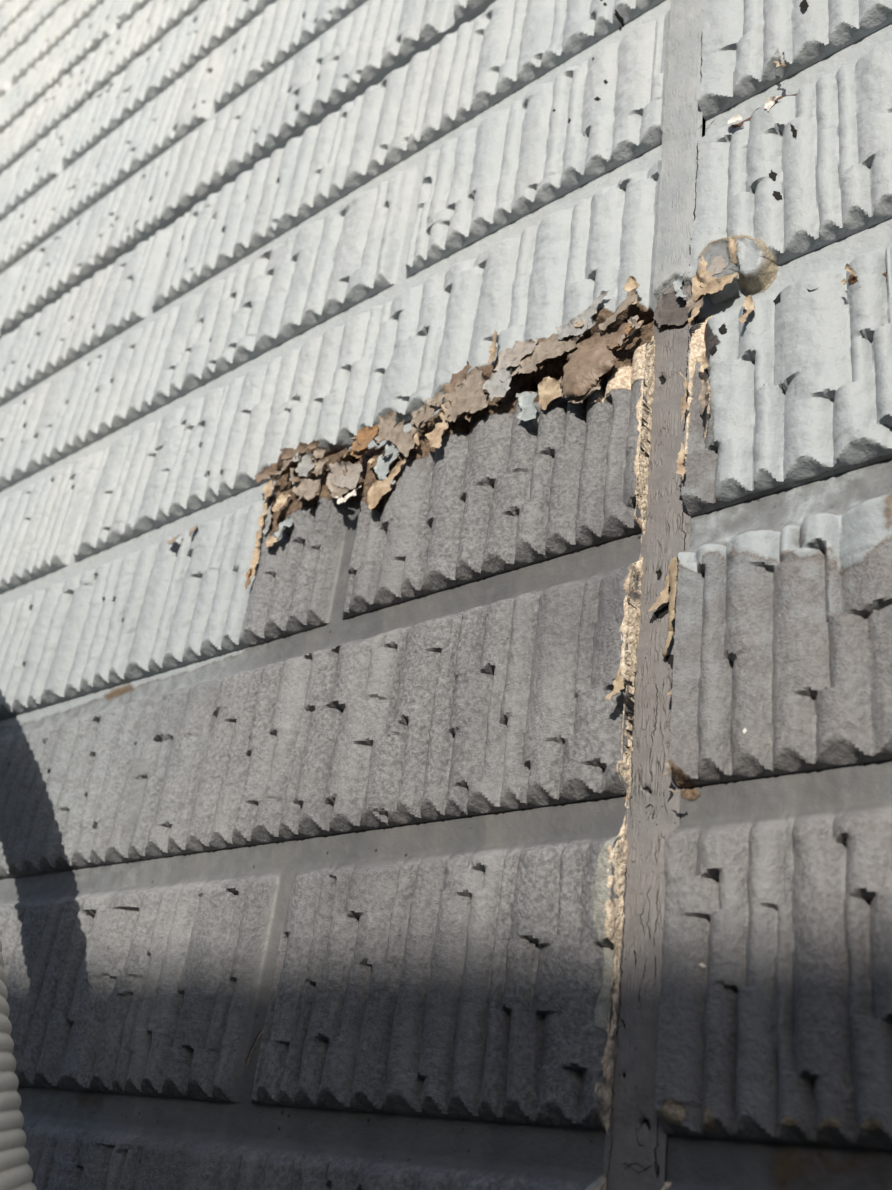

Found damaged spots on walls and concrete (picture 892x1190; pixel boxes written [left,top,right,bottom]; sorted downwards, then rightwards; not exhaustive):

crack [637,343,652,497]
peeling [673,270,727,481]
peeling [245,289,679,1134]
crack [624,651,668,818]
spalling [663,758,700,800]
crack [606,842,660,1190]
spalling [659,1098,687,1126]